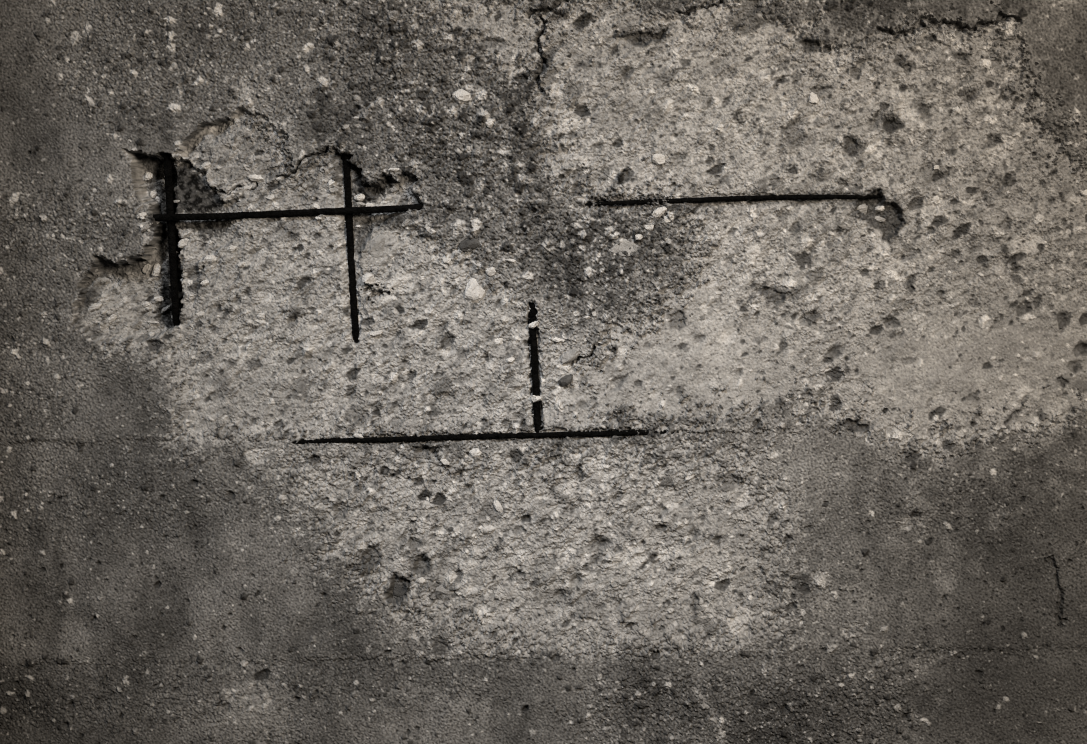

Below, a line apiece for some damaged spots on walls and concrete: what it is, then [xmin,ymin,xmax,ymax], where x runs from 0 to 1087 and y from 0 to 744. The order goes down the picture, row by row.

crack [526,0,570,93]
crack [677,0,725,16]
crack [876,13,1022,39]
spalling [452,83,472,104]
spalling [122,148,165,232]
crack [215,147,329,196]
spalling [889,475,931,536]
spalling [206,651,318,744]